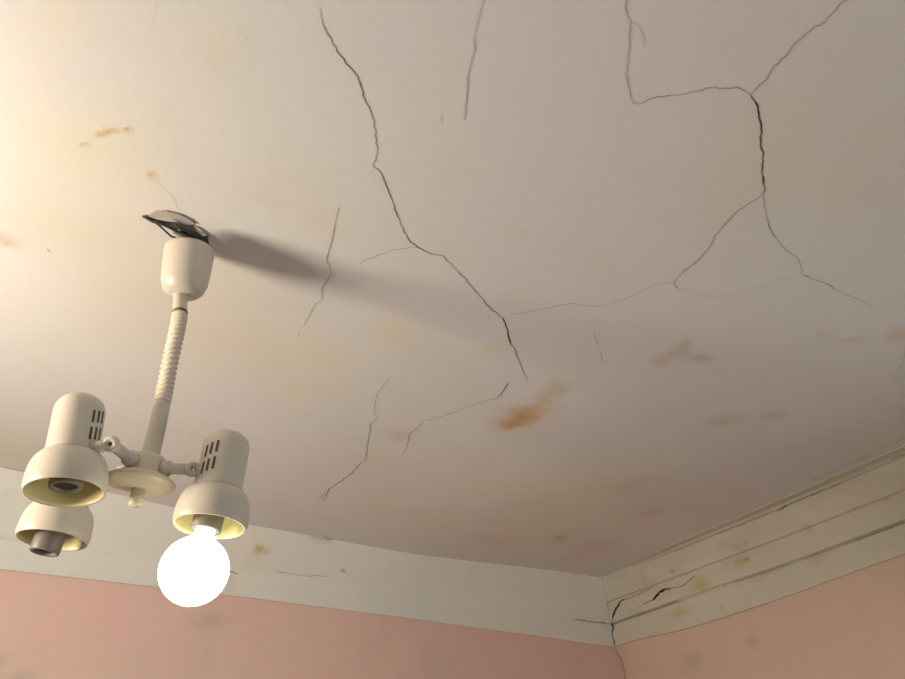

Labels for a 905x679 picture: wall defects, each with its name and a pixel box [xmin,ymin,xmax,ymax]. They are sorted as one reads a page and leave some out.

crack [695,49,791,193]
crack [319,8,527,397]
crack [578,576,694,658]